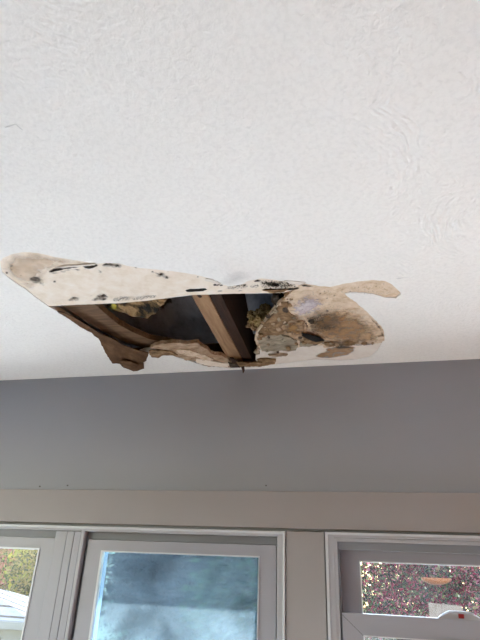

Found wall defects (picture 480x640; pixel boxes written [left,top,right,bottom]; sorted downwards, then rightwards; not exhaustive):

peeling [0,252,400,368]